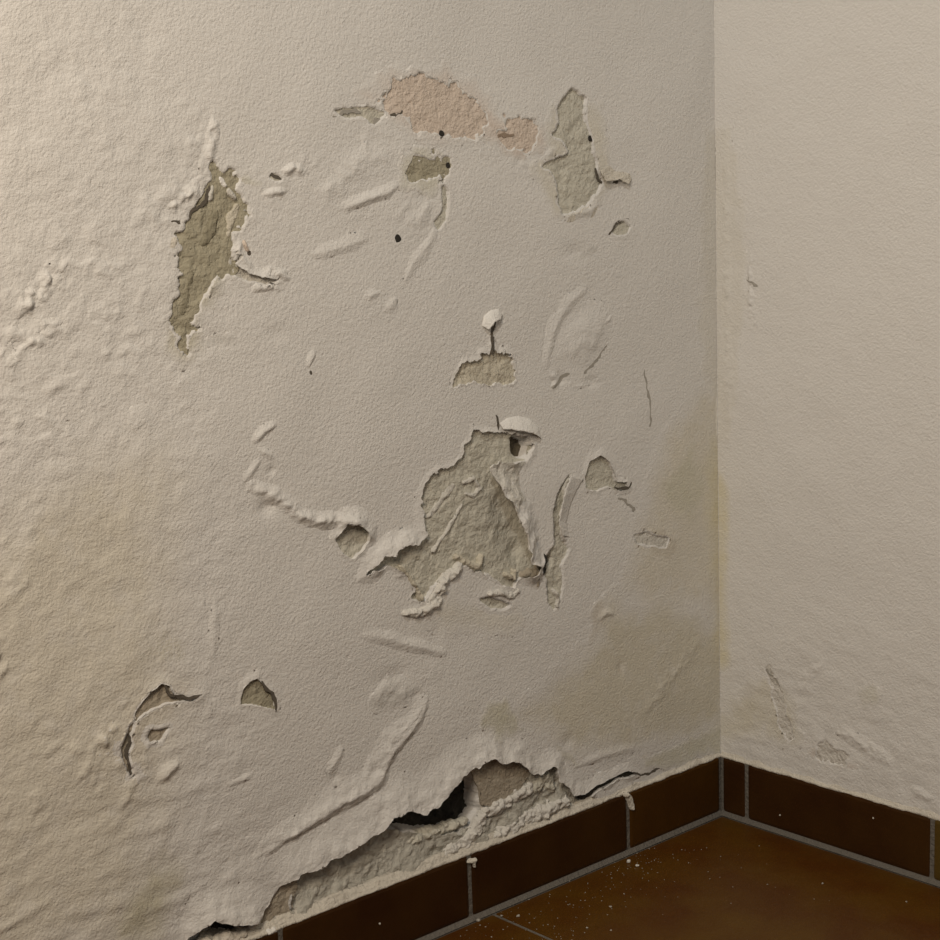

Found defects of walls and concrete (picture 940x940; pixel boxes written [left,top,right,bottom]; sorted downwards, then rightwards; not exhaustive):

flaking render [335,73,488,140]
flaking render [497,114,538,153]
flaking render [542,89,632,214]
flaking render [169,161,280,356]
flaking render [448,309,519,394]
flaking render [329,416,631,609]
flaking render [121,682,202,771]
peeling [235,668,281,716]
peeling [177,731,641,940]